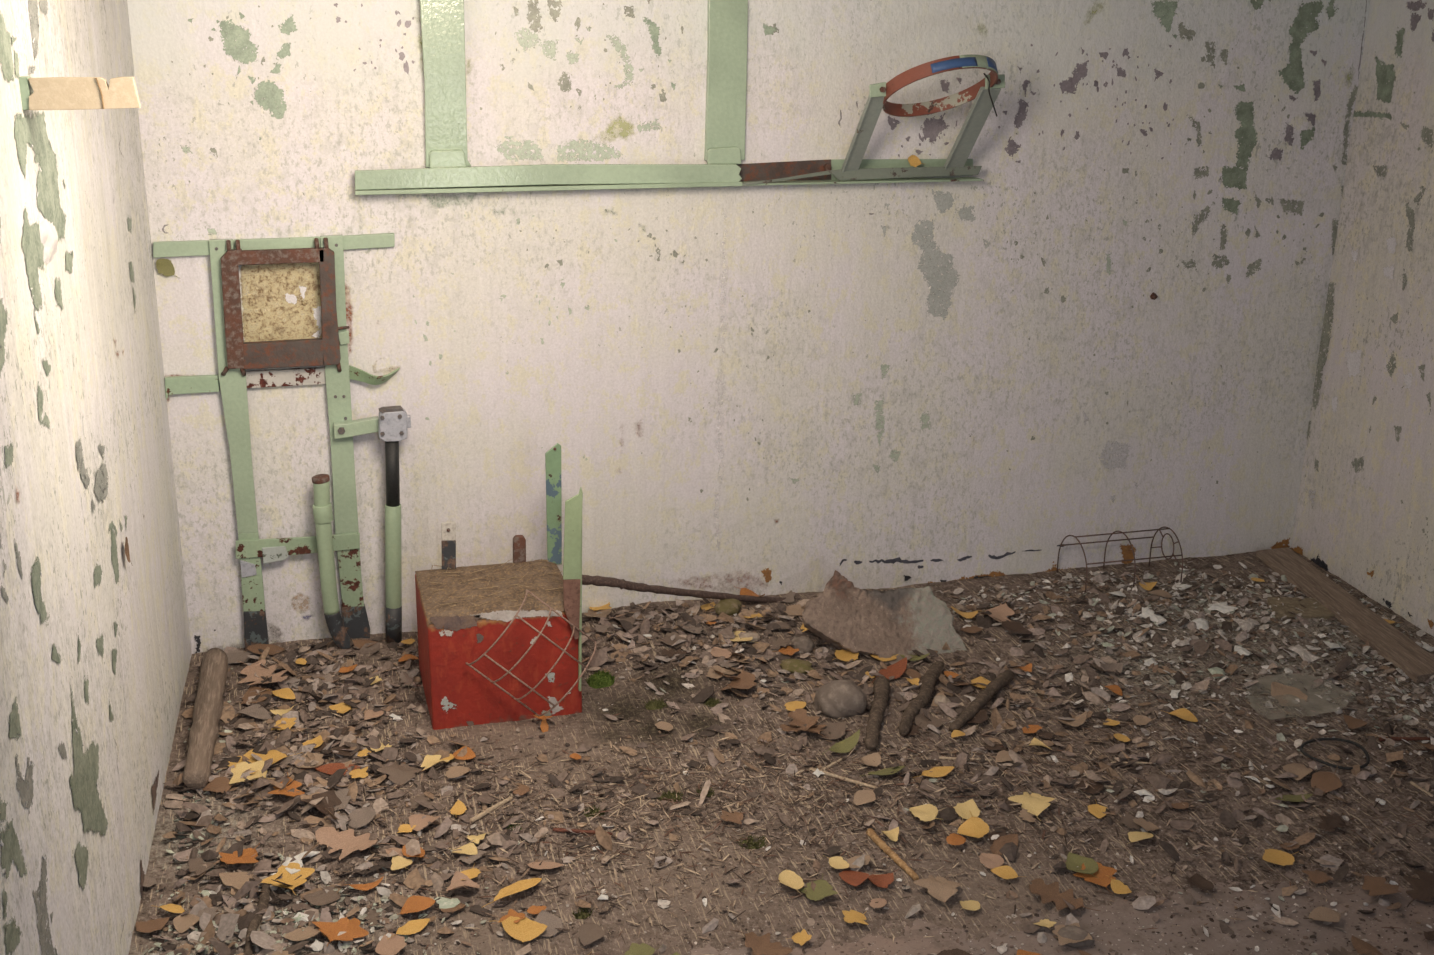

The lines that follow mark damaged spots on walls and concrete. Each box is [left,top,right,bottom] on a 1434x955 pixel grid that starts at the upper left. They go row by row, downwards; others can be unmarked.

peeling [208,5,311,119]
peeling [501,0,684,132]
peeling [1333,0,1434,170]
peeling [14,111,73,334]
peeling [1053,0,1344,439]
peeling [0,298,8,375]
peeling [37,357,51,427]
peeling [76,439,108,513]
peeling [0,534,50,627]
peeling [94,515,128,588]
peeling [59,623,118,889]
peeling [0,697,58,955]